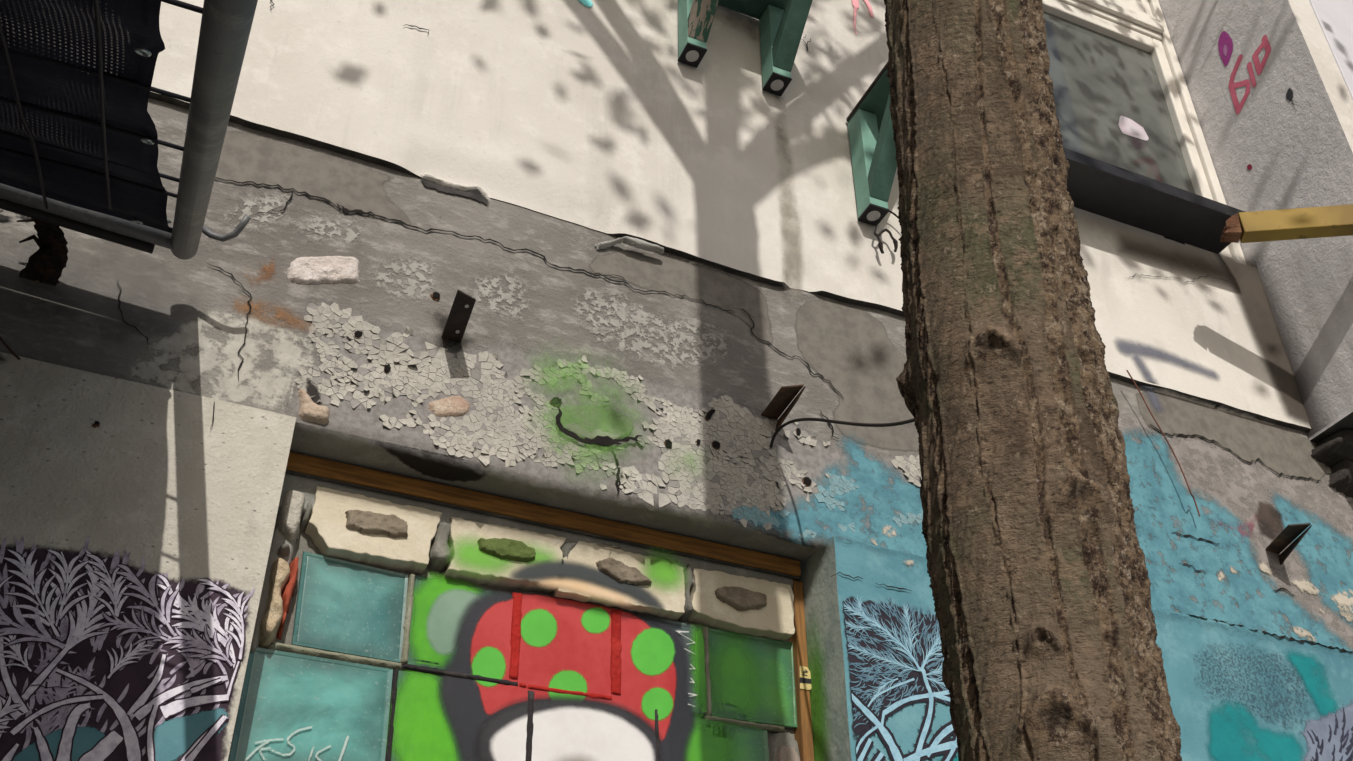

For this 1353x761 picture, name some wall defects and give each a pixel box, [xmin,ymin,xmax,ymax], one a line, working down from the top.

spalling [224,193,435,301]
spalling [595,236,664,254]
crack [117,279,153,346]
crack [207,263,252,380]
peeling [474,274,528,321]
crack [215,177,844,439]
peeling [293,289,859,548]
peeling [891,455,922,487]
peeling [871,511,923,545]
peeling [1292,579,1353,622]
peeling [1293,627,1316,642]